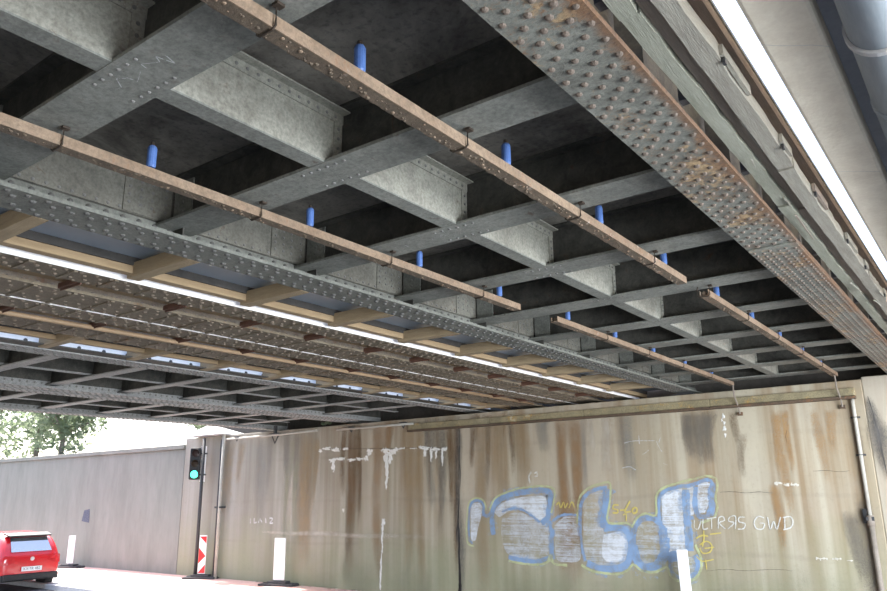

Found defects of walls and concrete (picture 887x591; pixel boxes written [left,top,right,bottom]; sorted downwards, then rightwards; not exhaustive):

corrosion [340,419,426,588]
corrosion [444,413,516,574]
water stain [680,411,747,477]
water stain [757,415,878,591]